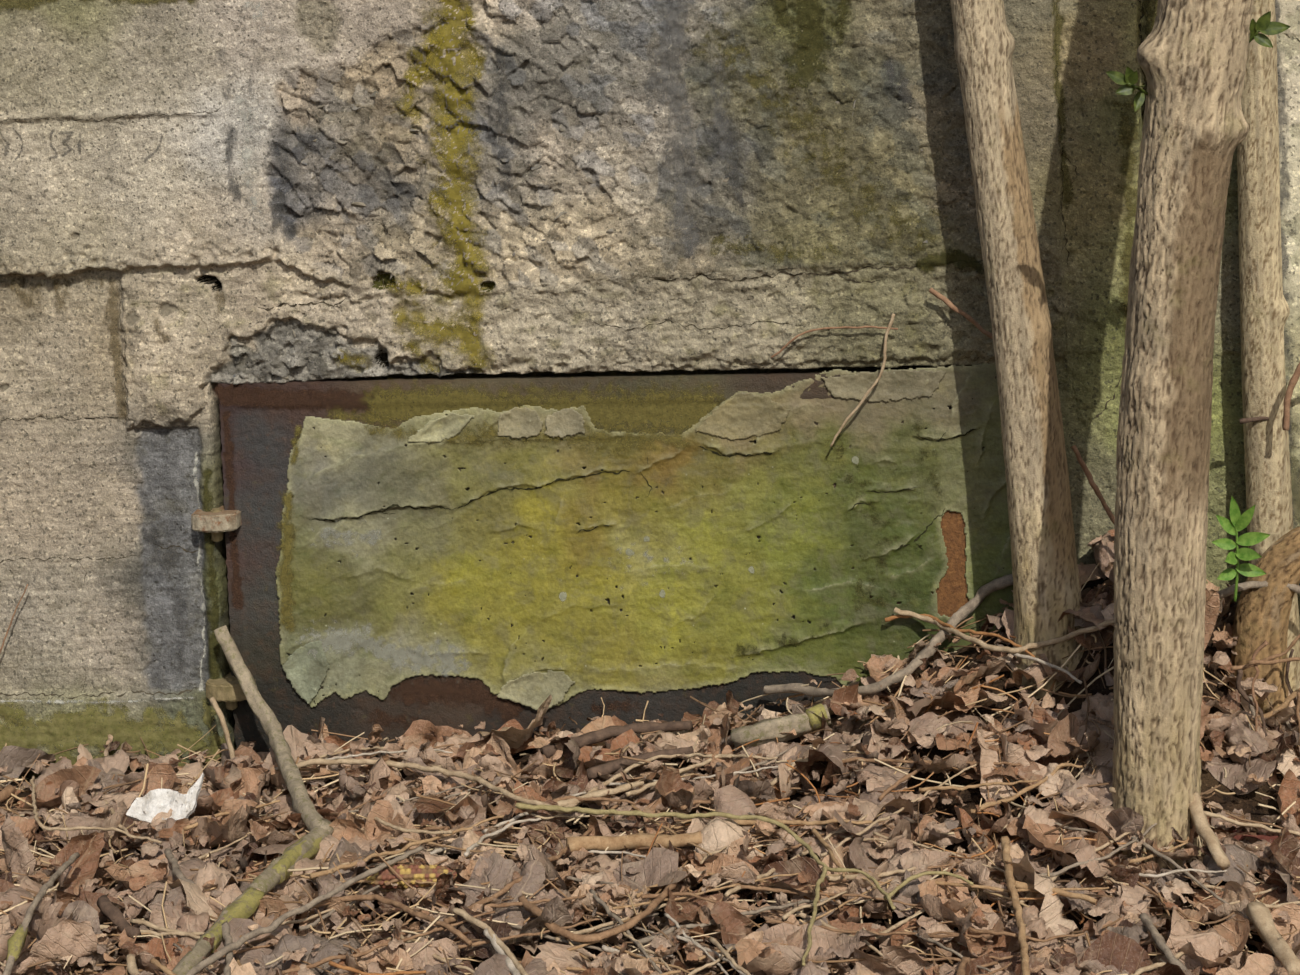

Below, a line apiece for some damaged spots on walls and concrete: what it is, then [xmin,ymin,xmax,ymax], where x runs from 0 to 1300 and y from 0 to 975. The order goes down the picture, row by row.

water stain [401,32,443,119]
water stain [390,278,425,294]
corrosion [213,383,374,510]
corrosion [229,530,243,610]
peeling [275,363,1014,710]
corrosion [931,510,969,618]
water stain [0,699,138,725]